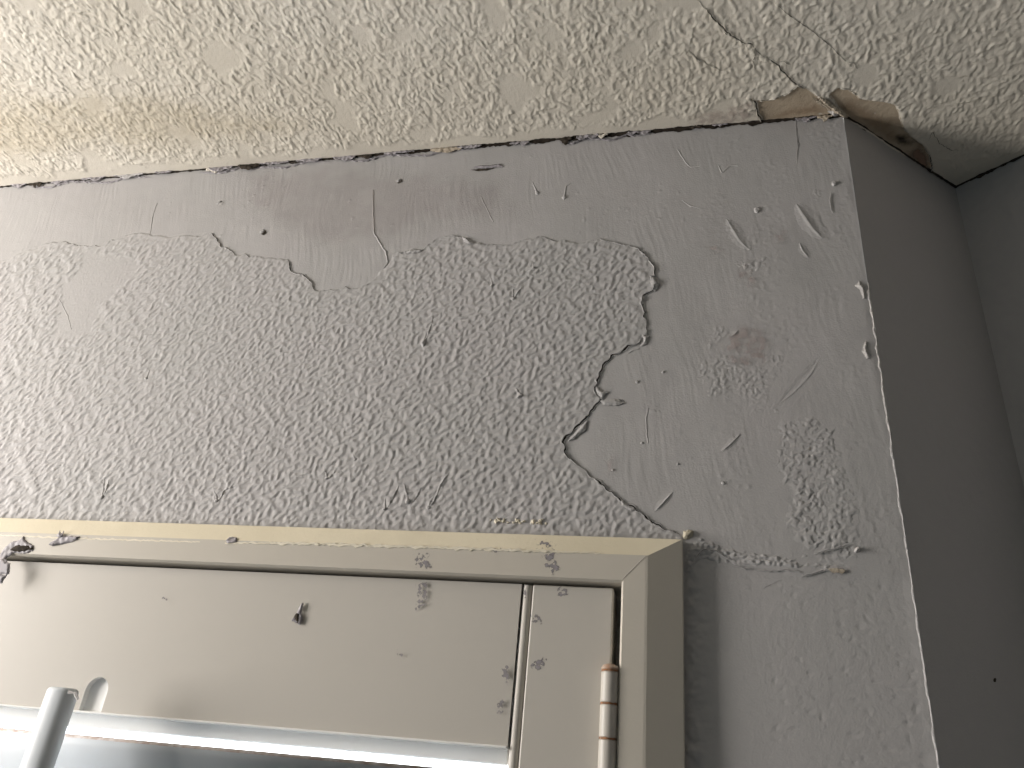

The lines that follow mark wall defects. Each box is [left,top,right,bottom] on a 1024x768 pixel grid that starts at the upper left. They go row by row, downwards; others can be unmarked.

crack [0,0,1024,188]
peeling [750,87,933,171]
peeling [286,259,380,292]
peeling [560,238,679,535]
peeling [0,536,34,584]
peeling [49,531,80,546]